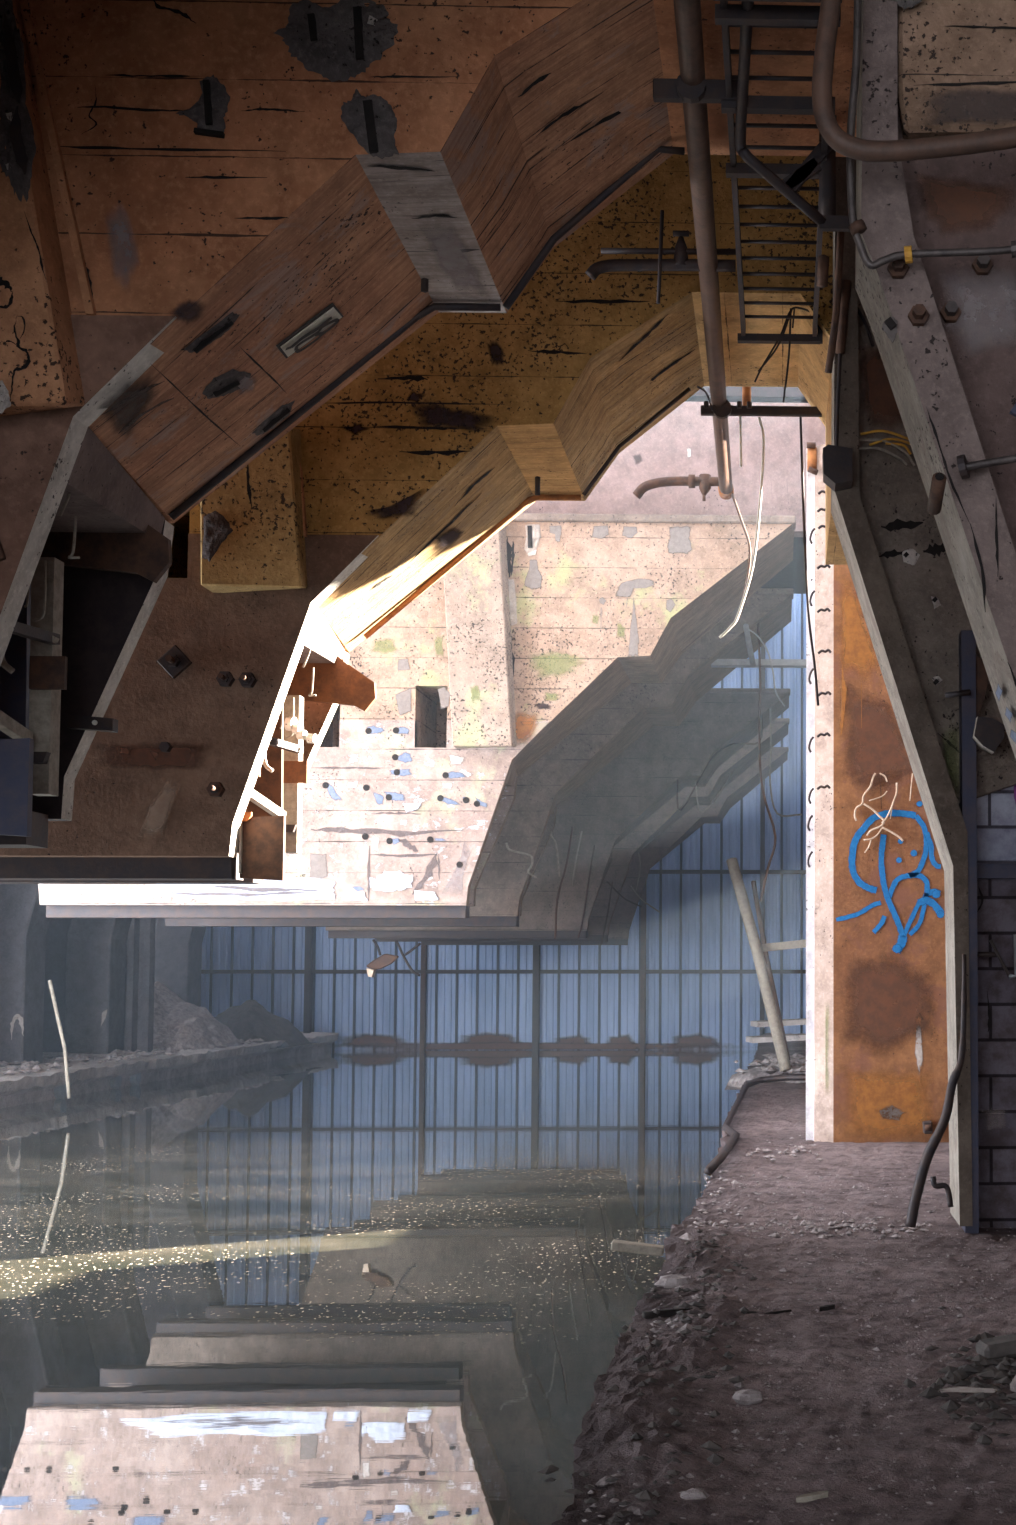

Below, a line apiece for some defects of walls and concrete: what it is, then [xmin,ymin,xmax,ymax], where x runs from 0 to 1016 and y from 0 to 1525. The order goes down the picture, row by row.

spalling [0,0,36,202]
spalling [176,75,230,139]
spalling [274,0,399,159]
crack [0,212,46,401]
rust [840,587,912,809]
rust [845,961,932,1048]